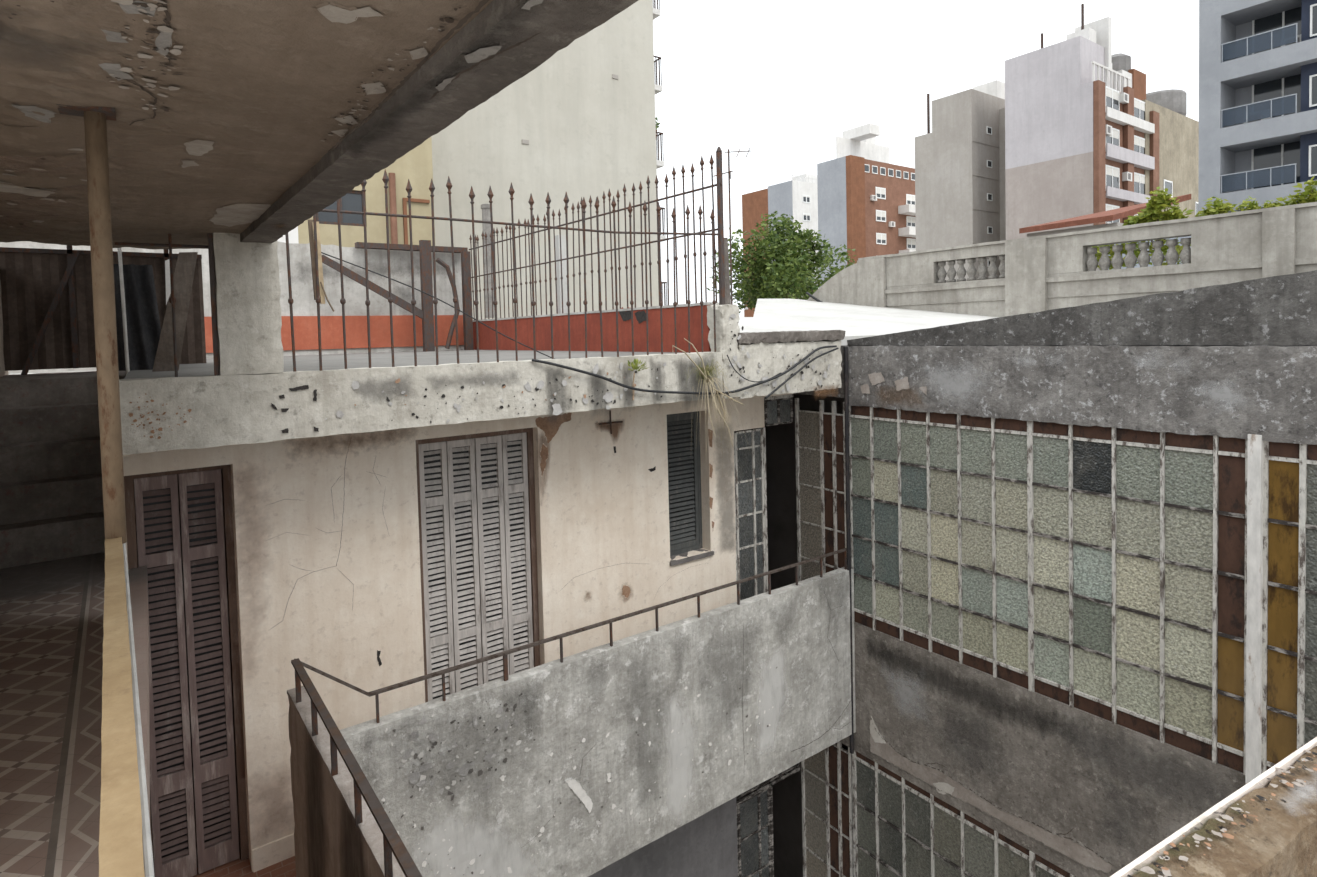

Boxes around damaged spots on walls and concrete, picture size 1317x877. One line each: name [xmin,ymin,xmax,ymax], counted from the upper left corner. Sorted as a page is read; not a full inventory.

flaking render [96,0,183,113]
peeling [311,2,383,24]
peeling [321,7,461,141]
flaking render [430,40,506,91]
flaking render [519,0,543,10]
flaking render [382,362,666,477]
crack [266,437,389,629]